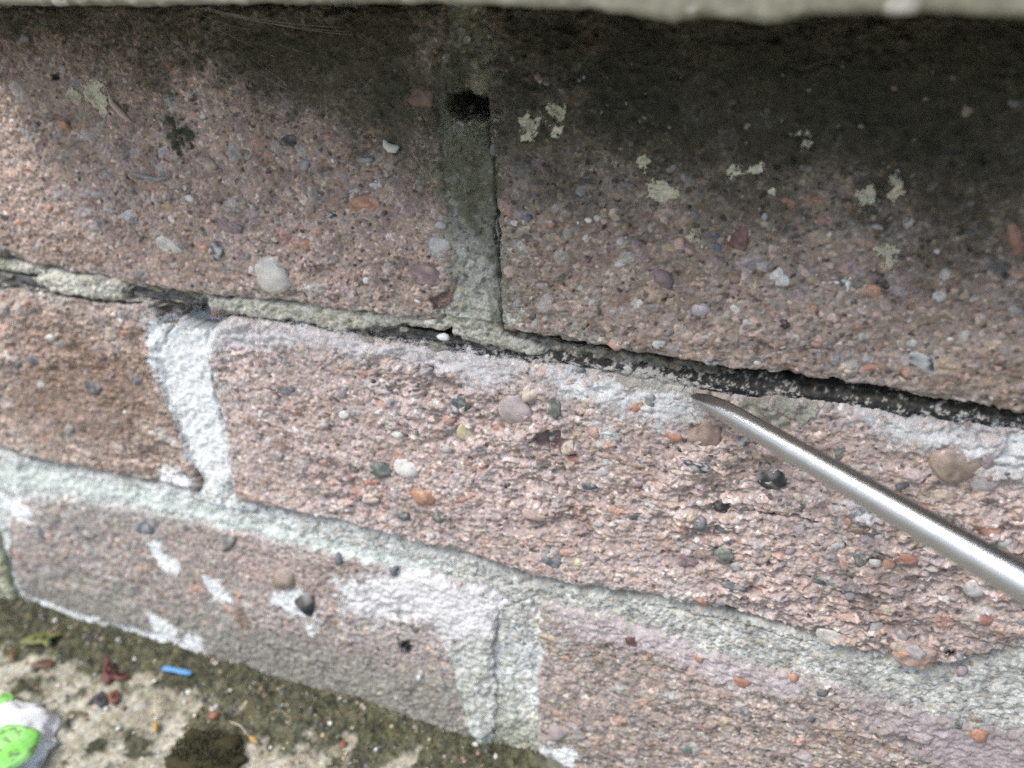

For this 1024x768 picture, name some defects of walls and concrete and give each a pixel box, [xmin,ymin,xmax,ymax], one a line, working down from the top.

crack [492,159,505,324]
crack [213,314,344,335]
crack [370,335,531,363]
crack [535,333,659,356]
crack [818,381,997,409]